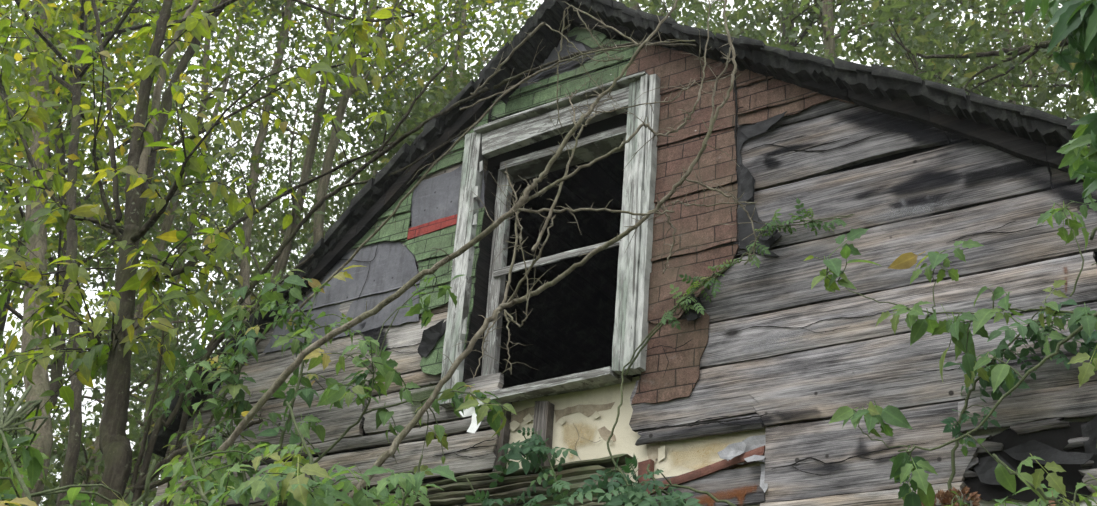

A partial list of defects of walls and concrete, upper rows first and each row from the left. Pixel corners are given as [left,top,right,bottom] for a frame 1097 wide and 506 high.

peeling [452,317,467,385]
flaking render [554,402,616,445]
flaking render [647,442,666,465]
peeling [717,434,768,493]
rust [696,486,756,506]